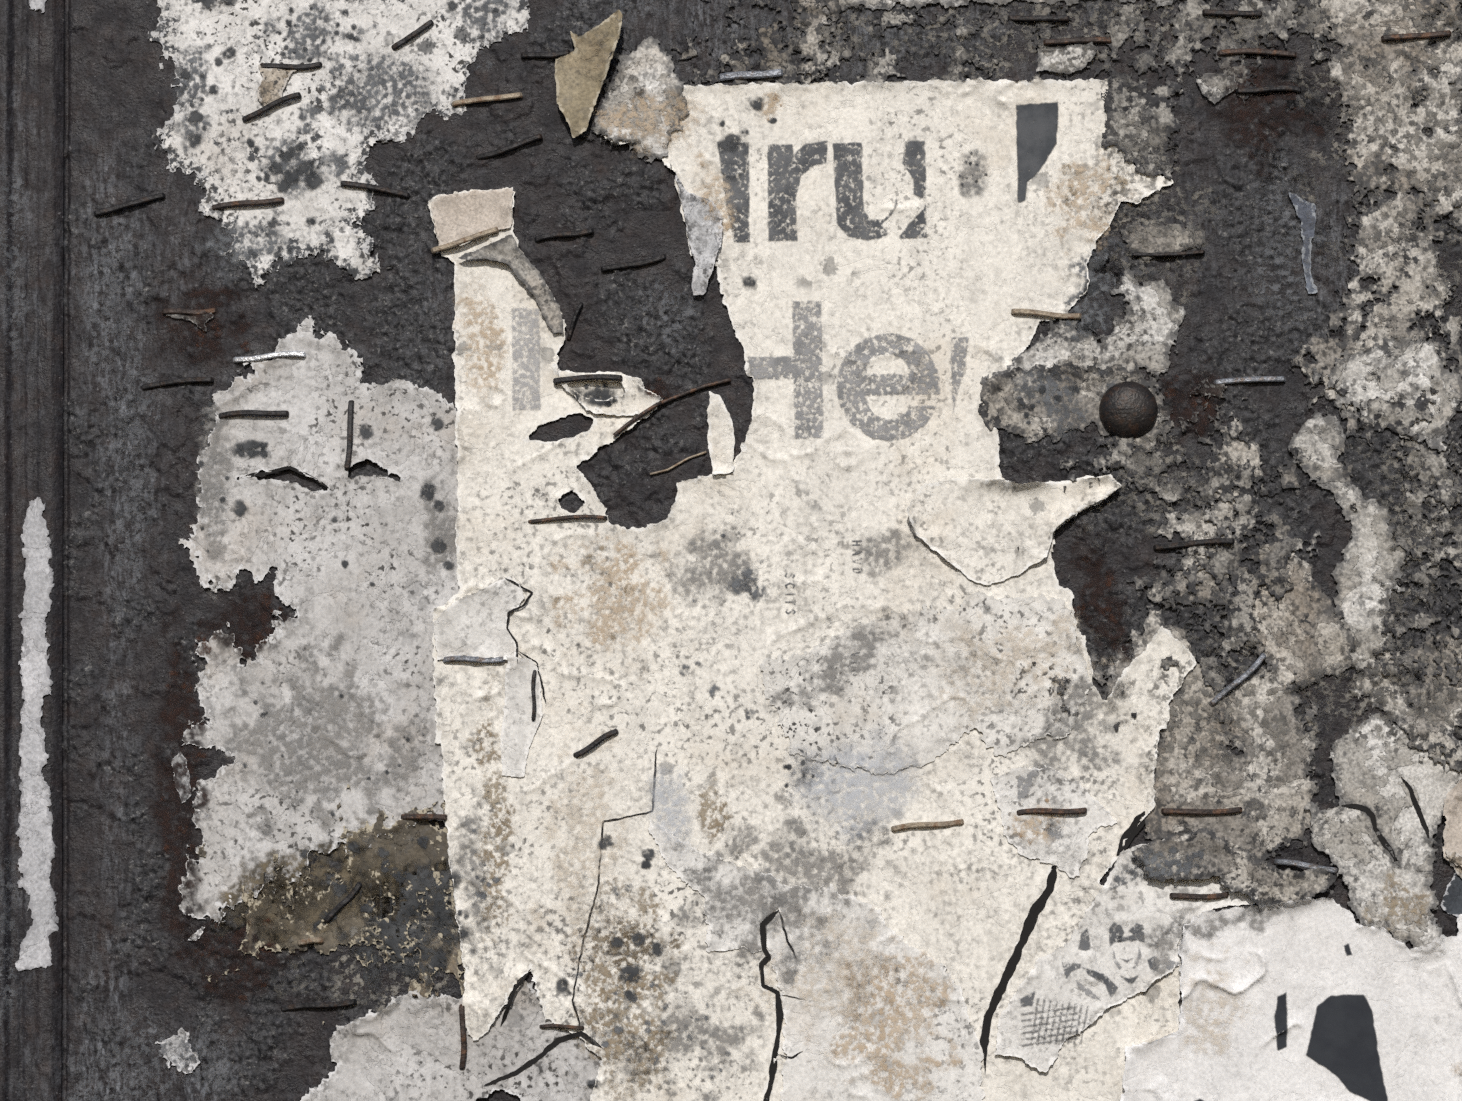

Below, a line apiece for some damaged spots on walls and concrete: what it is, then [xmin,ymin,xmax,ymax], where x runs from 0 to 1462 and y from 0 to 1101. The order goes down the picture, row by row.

leakage [221,635,515,1014]
crack [759,910,802,1101]
crack [980,865,1057,1071]